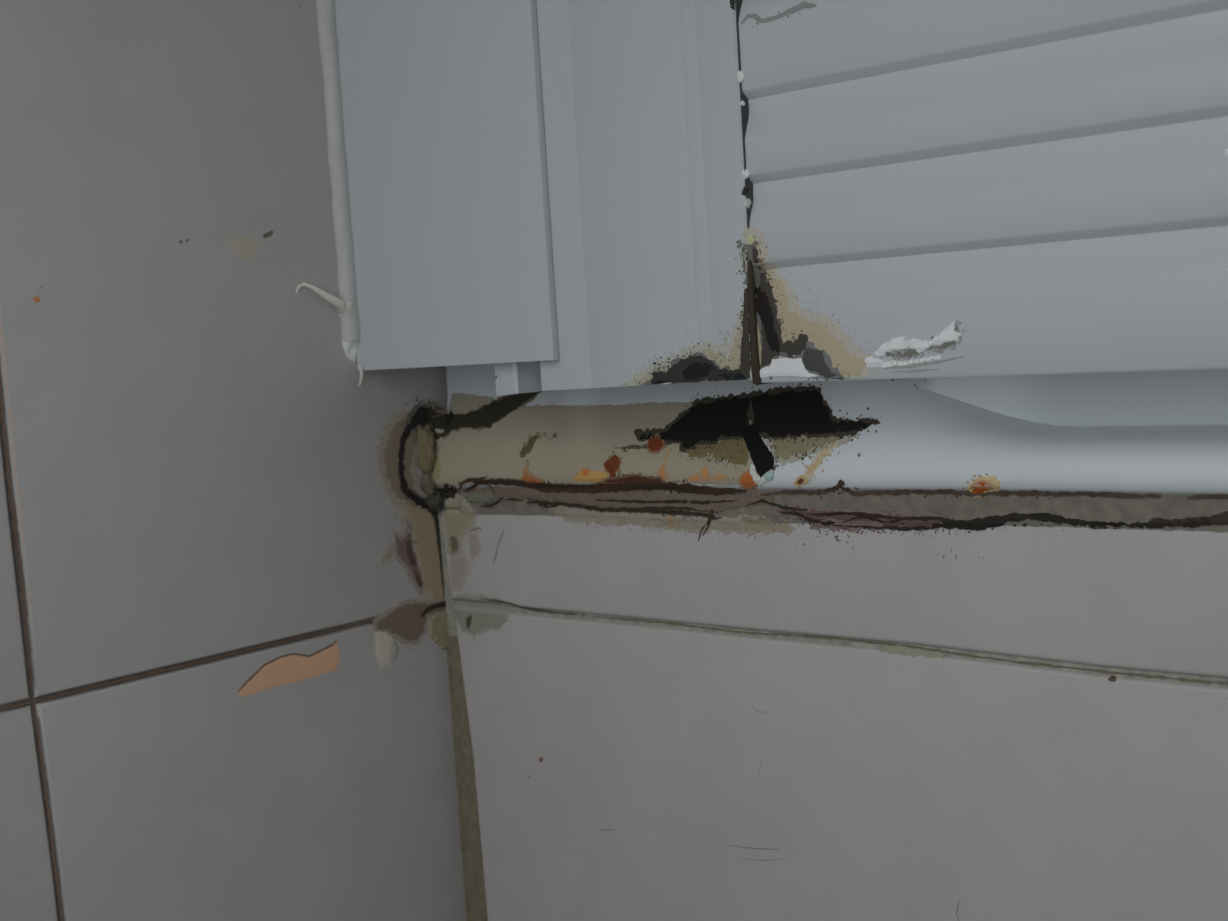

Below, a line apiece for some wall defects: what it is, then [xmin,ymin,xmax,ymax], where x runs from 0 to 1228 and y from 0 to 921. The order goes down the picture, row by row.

damp [606,216,928,472]
peeling [865,319,961,368]
corrosion [507,431,758,494]
damp [364,391,956,601]
crack [472,425,1228,535]
corrosion [963,474,1000,502]
crack [420,510,446,618]
peeling [238,641,340,697]
crack [480,598,1228,685]